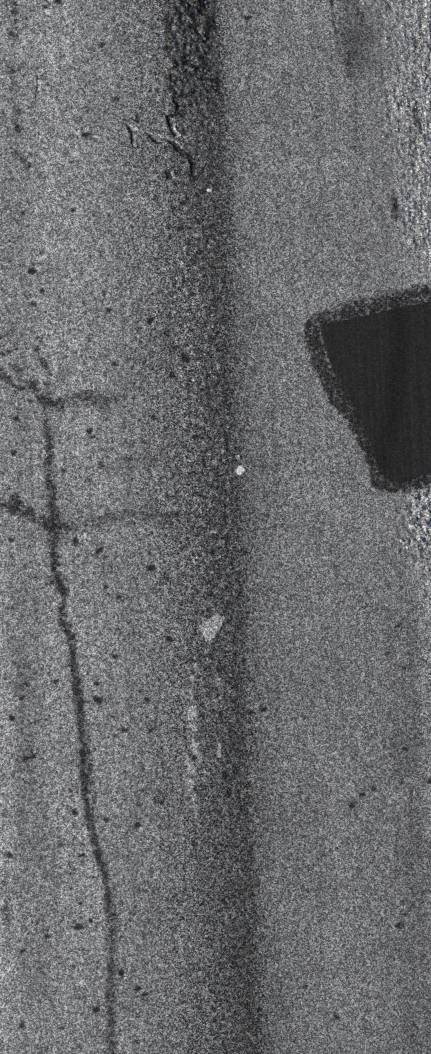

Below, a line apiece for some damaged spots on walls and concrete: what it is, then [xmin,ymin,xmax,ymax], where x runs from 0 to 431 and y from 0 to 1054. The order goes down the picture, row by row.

crack [124,73,195,182]
crack [0,331,156,1054]